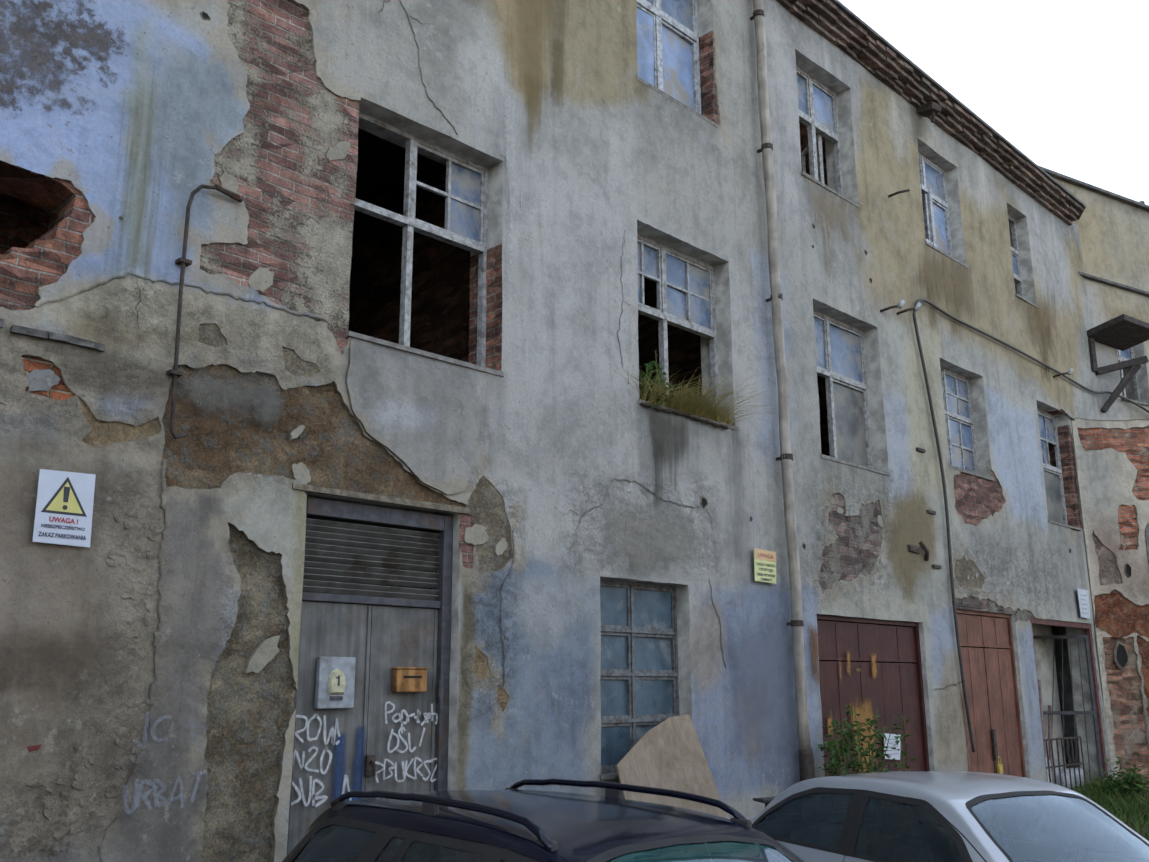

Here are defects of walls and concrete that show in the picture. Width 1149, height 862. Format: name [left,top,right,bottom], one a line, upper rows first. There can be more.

peeling [0,0,119,113]
crack [379,0,459,135]
flaking render [0,165,96,311]
flaking render [198,0,360,355]
crack [617,230,629,368]
crack [97,459,169,862]
spalling [201,522,297,862]
spalling [21,346,513,571]
crack [563,476,727,668]
spalling [818,492,884,593]
flaking render [954,469,1006,526]
flaking render [1057,409,1149,789]